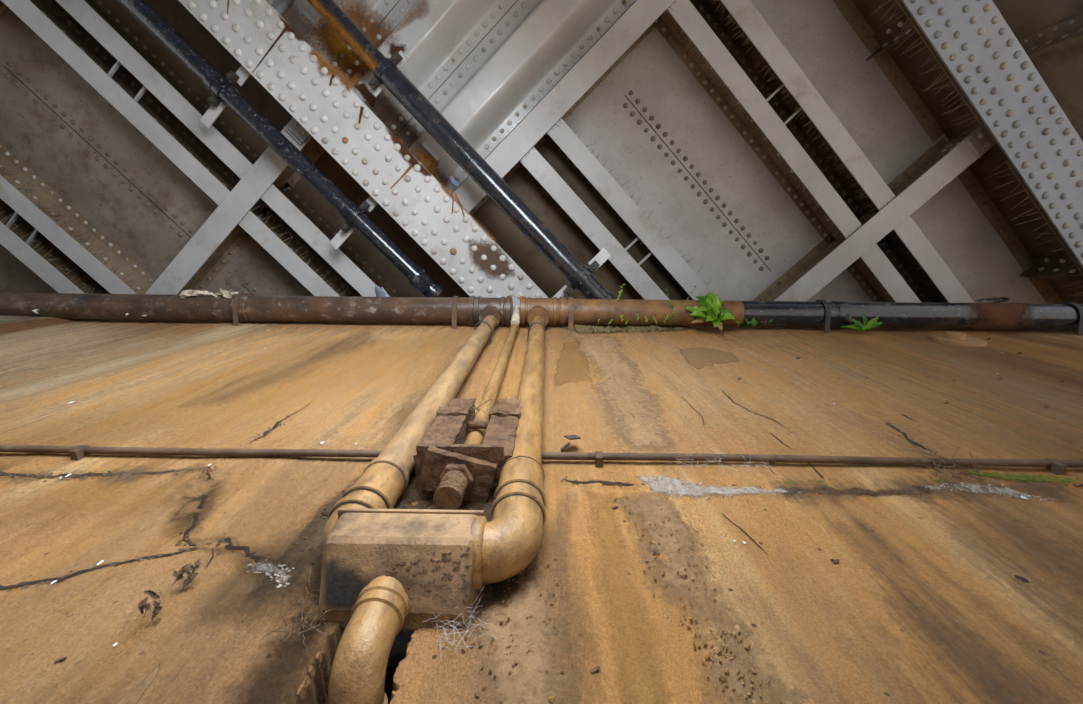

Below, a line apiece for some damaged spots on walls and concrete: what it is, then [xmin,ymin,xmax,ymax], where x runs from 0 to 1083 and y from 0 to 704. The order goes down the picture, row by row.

rust [252,0,494,240]
water stain [0,320,466,481]
crack [248,402,313,444]
water stain [641,474,835,499]
water stain [898,481,1063,501]
crack [0,466,271,592]
spalling [297,652,323,699]